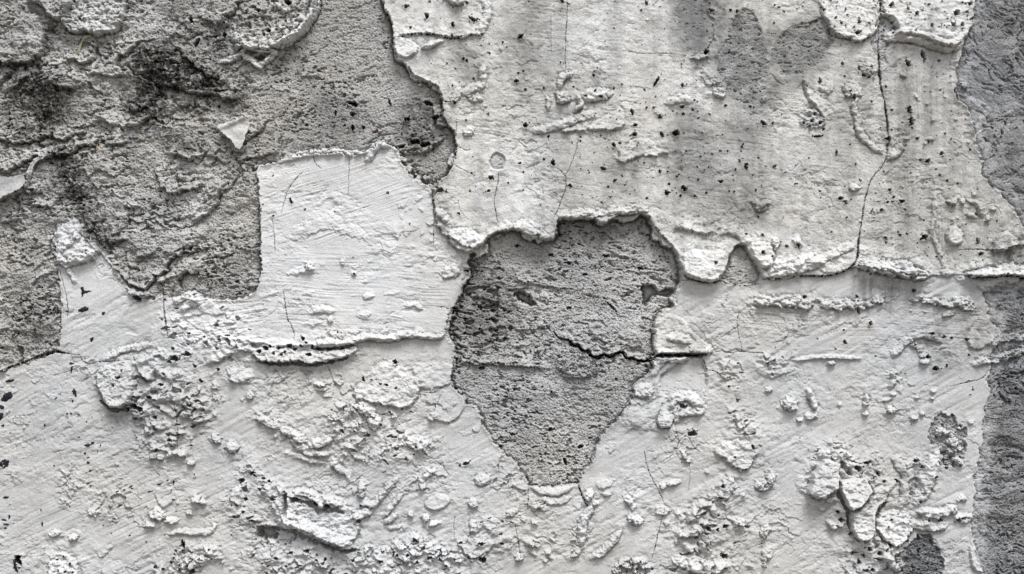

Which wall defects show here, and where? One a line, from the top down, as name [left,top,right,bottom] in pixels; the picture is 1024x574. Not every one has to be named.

spalling [0,0,458,372]
crack [554,315,760,379]
spalling [384,0,1024,488]
crack [679,0,889,287]
spalling [970,275,1024,574]